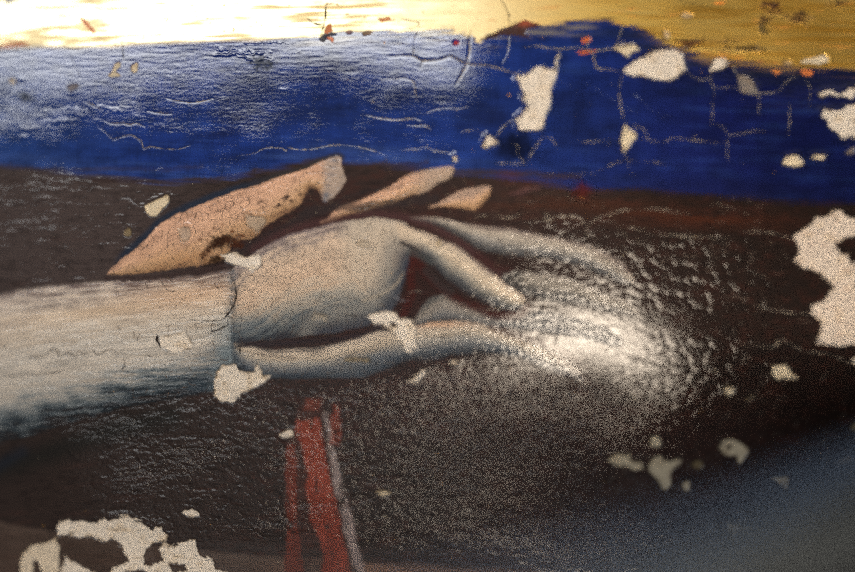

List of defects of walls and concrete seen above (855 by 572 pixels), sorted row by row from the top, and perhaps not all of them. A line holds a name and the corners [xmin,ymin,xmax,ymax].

crack [387,0,536,96]
peeling [612,30,686,82]
crack [369,107,465,153]
crack [463,118,557,165]
peeling [516,54,560,131]
crack [532,26,811,170]
peeling [819,89,855,155]
crack [475,208,789,238]
peeling [793,210,855,347]
peeling [368,312,418,353]
peeling [215,364,271,403]
peeling [20,515,222,572]